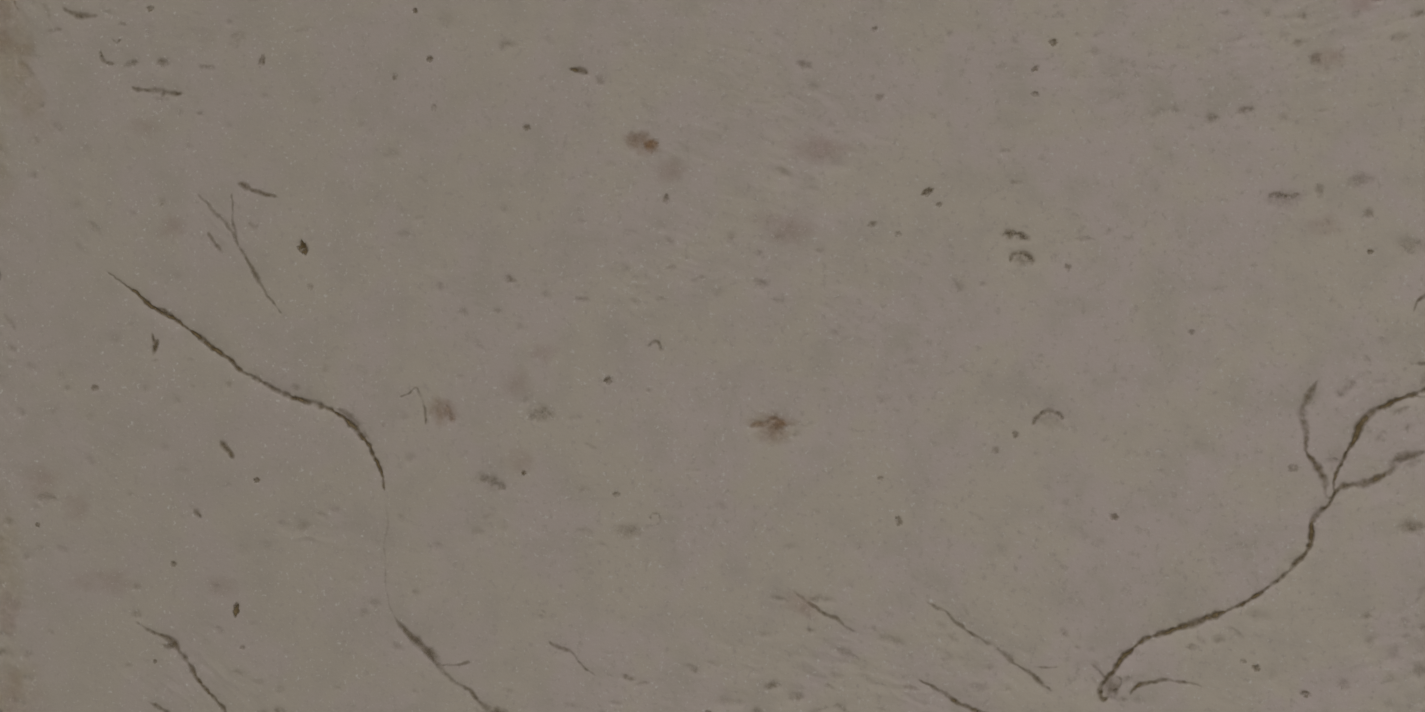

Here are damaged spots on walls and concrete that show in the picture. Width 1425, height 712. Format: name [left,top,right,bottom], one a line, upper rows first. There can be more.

crack [131,289,384,488]
crack [1099,389,1425,701]
crack [153,632,225,709]